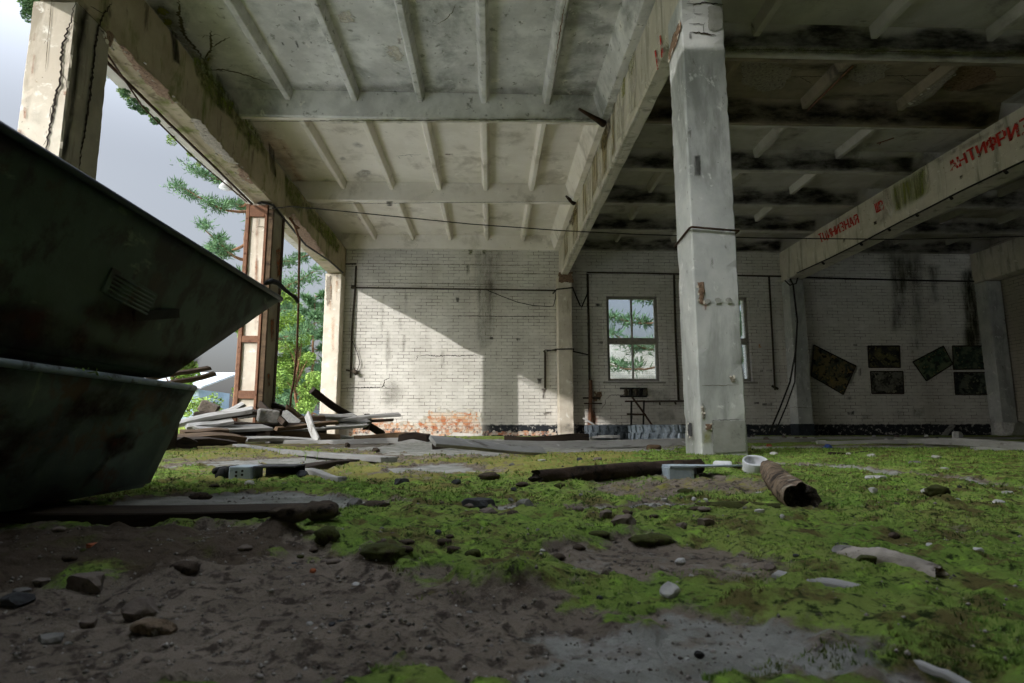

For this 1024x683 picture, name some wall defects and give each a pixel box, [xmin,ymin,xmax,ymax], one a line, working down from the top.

crack [44,2,112,170]
crack [175,0,269,87]
peeling [191,119,253,189]
flaking render [349,407,557,436]